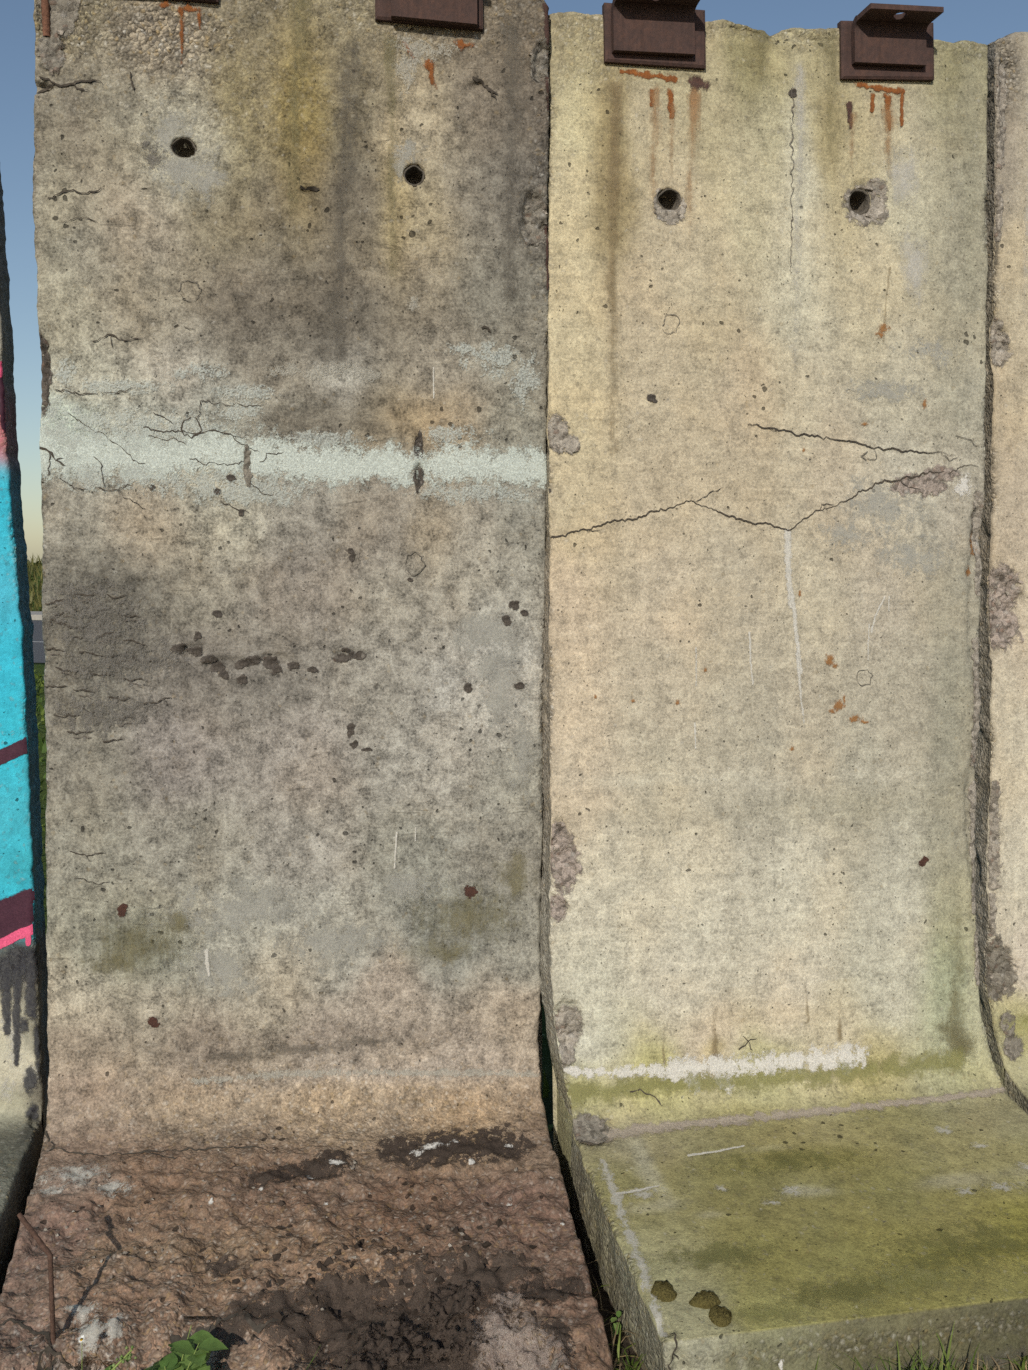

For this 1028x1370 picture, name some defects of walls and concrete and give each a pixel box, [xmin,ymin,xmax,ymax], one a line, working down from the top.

rust [403,41,437,89]
rust [620,69,710,135]
rust [846,82,905,152]
crack [39,387,283,513]
crack [550,424,978,539]
spalling [890,464,961,498]
spalling [967,490,1024,1061]
spalling [550,821,582,923]
crack [42,1130,275,1159]
leakage [687,1145,744,1156]
leakage [600,1159,667,1338]
spalling [466,1291,571,1370]